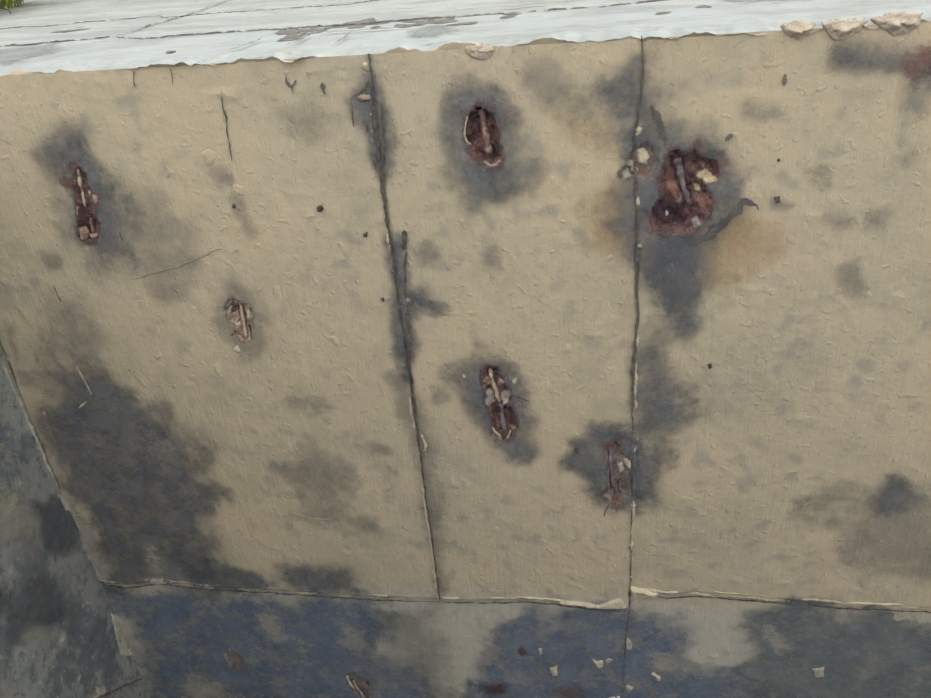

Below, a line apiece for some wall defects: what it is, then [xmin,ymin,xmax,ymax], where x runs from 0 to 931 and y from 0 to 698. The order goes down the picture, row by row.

spalling [780,12,923,41]
spalling [462,104,504,168]
damp [36,133,125,261]
spalling [59,163,102,244]
spalling [618,141,727,235]
crack [351,53,440,600]
spalling [480,365,530,441]
damp [561,352,692,509]
crack [622,36,668,698]
damp [33,371,433,698]
damp [876,475,921,513]
damp [466,597,931,698]